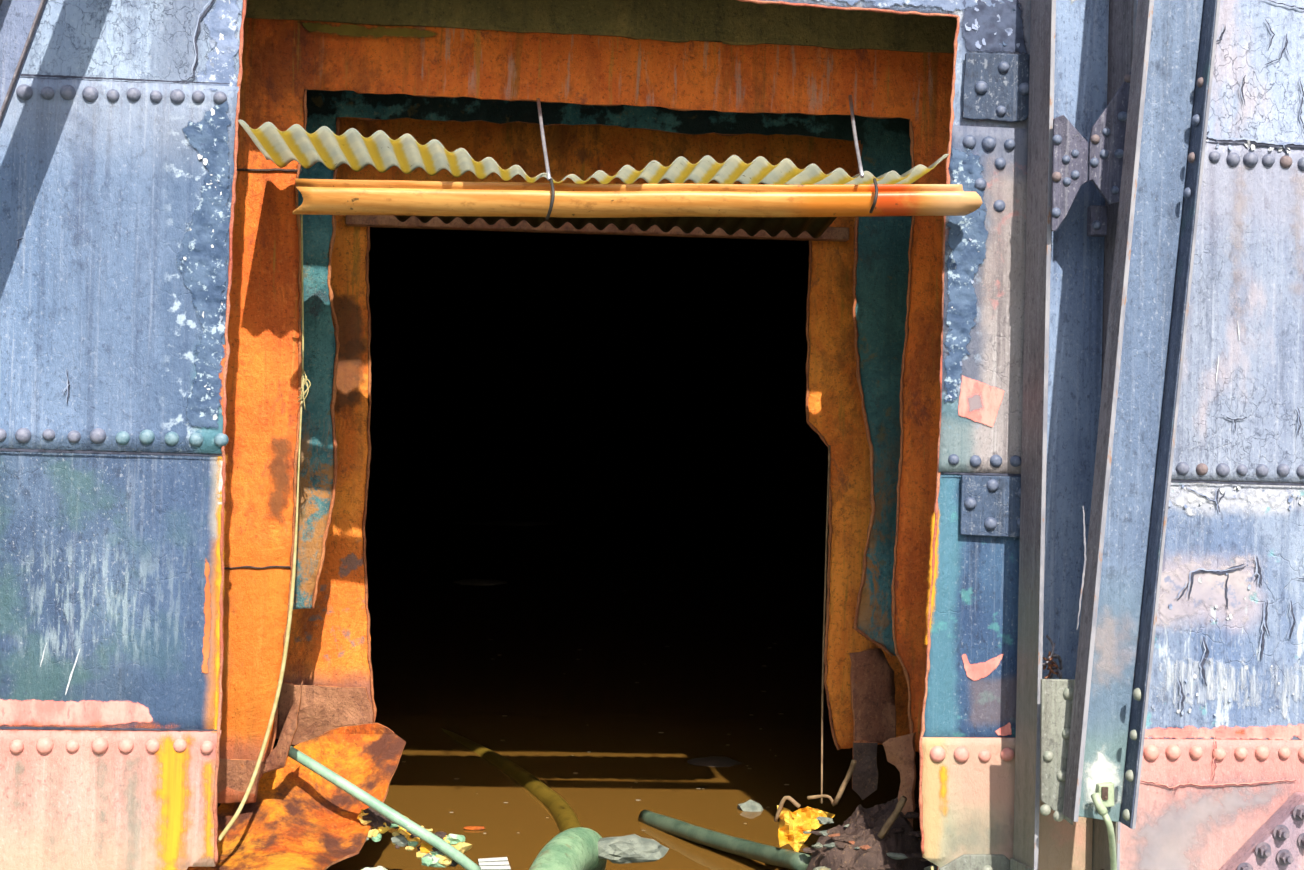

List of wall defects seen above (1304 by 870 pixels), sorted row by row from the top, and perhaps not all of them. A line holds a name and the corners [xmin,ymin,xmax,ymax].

crack [173,0,214,83]
crack [1206,0,1304,153]
corrosion [331,292,365,412]
corrosion [270,438,290,520]
corrosion [926,512,939,644]
crack [1176,557,1304,660]
corrosion [141,723,406,870]